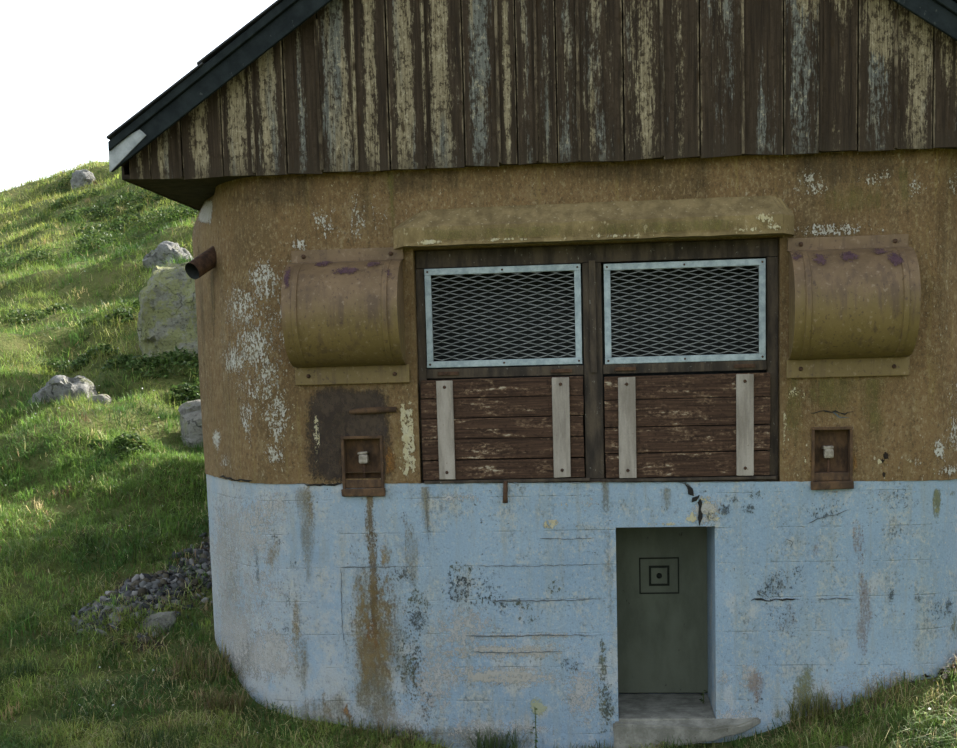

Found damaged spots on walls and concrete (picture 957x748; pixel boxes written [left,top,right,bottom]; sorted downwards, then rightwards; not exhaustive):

peeling [219,258,295,466]
peeling [933,417,957,475]
crack [679,482,703,526]
rust [351,497,395,716]
leakage [441,561,535,624]